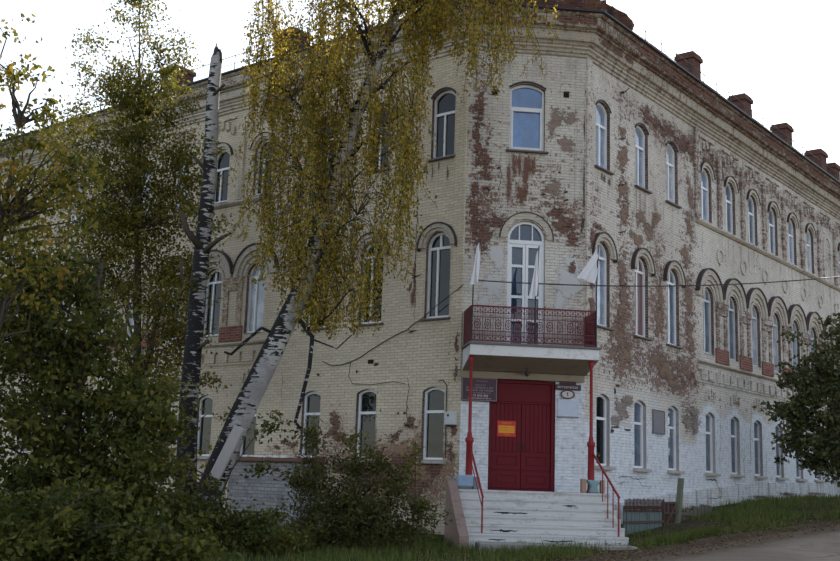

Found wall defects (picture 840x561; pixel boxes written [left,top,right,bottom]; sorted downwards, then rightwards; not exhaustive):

spalling [547,91,578,153]
spalling [467,89,506,308]
spalling [606,105,727,392]
spalling [324,410,346,443]
spalling [358,412,442,504]
spalling [446,427,458,463]
spalling [611,385,633,433]
spalling [682,404,703,435]